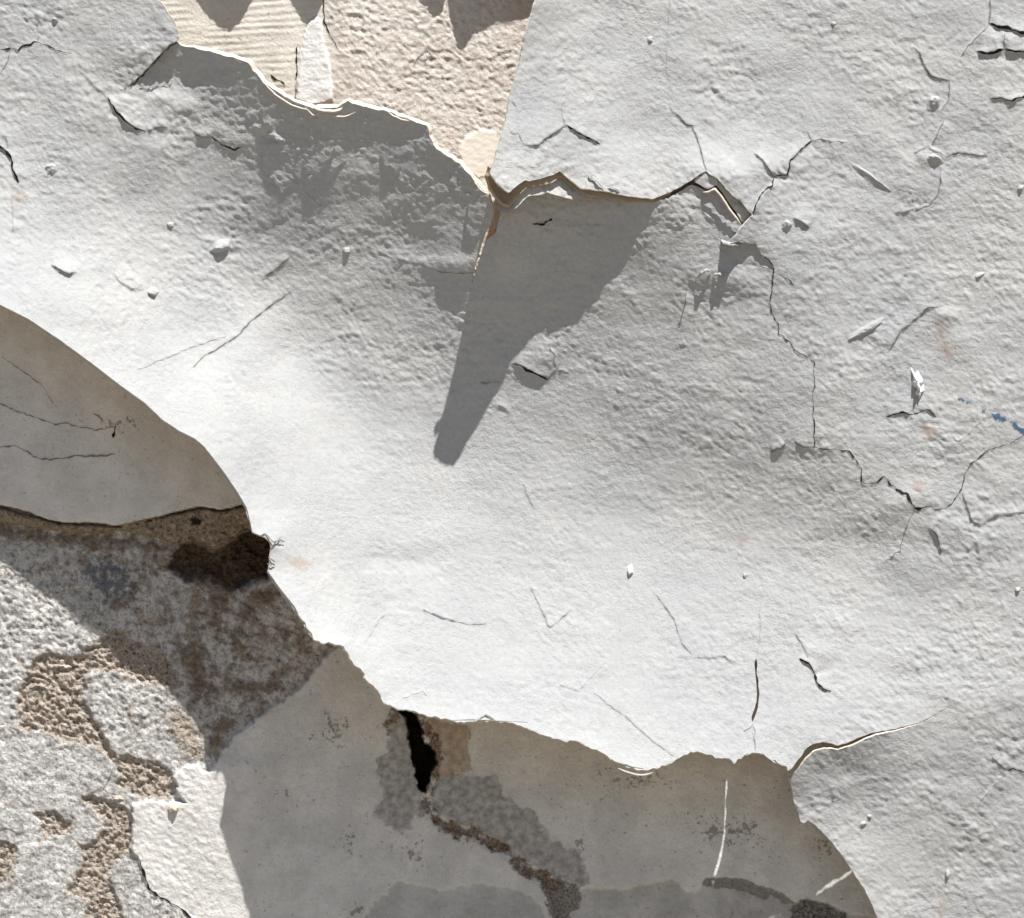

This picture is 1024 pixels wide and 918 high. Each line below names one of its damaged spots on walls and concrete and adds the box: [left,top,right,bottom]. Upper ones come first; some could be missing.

peeling [0,0,180,89]
spalling [296,17,334,105]
crack [961,0,1024,56]
crack [0,136,19,232]
crack [752,132,848,214]
peeling [0,41,1024,771]
crack [764,256,1024,559]
leakage [77,553,139,608]
leakage [181,642,218,705]
crack [796,634,831,691]
spalling [14,628,183,918]
leakage [374,709,589,886]